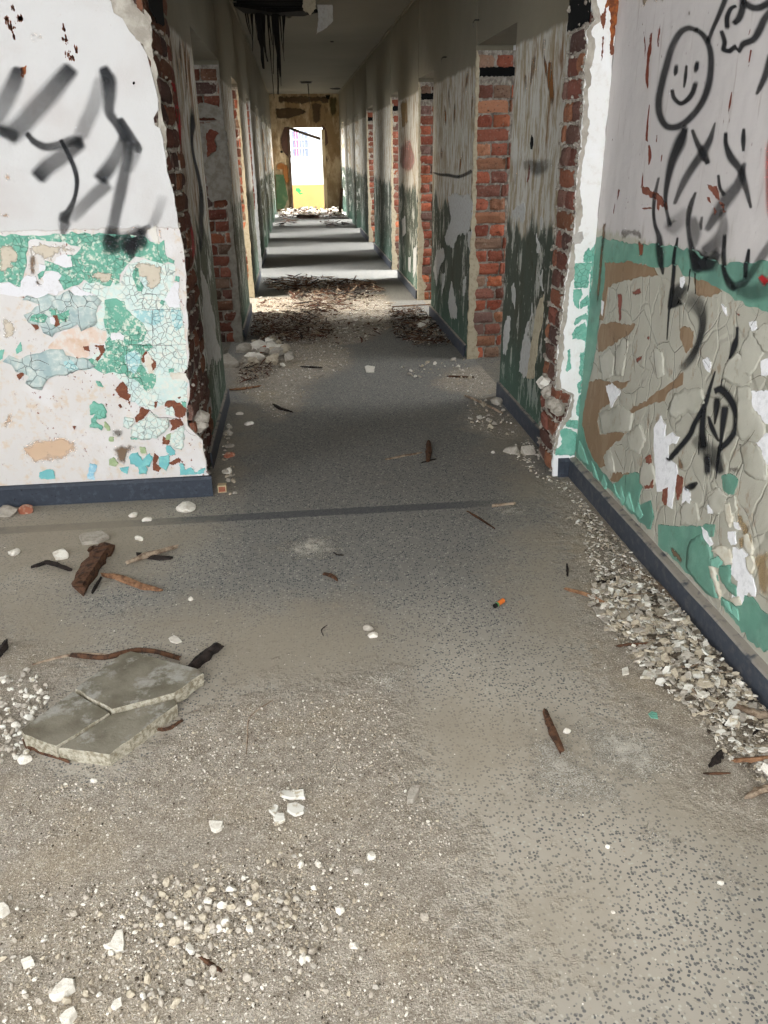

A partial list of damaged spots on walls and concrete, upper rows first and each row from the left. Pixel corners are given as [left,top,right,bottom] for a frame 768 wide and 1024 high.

spalling [479,66,515,77]
peeling [198,103,232,202]
spalling [0,0,221,480]
crack [104,245,186,386]
spalling [503,0,768,652]